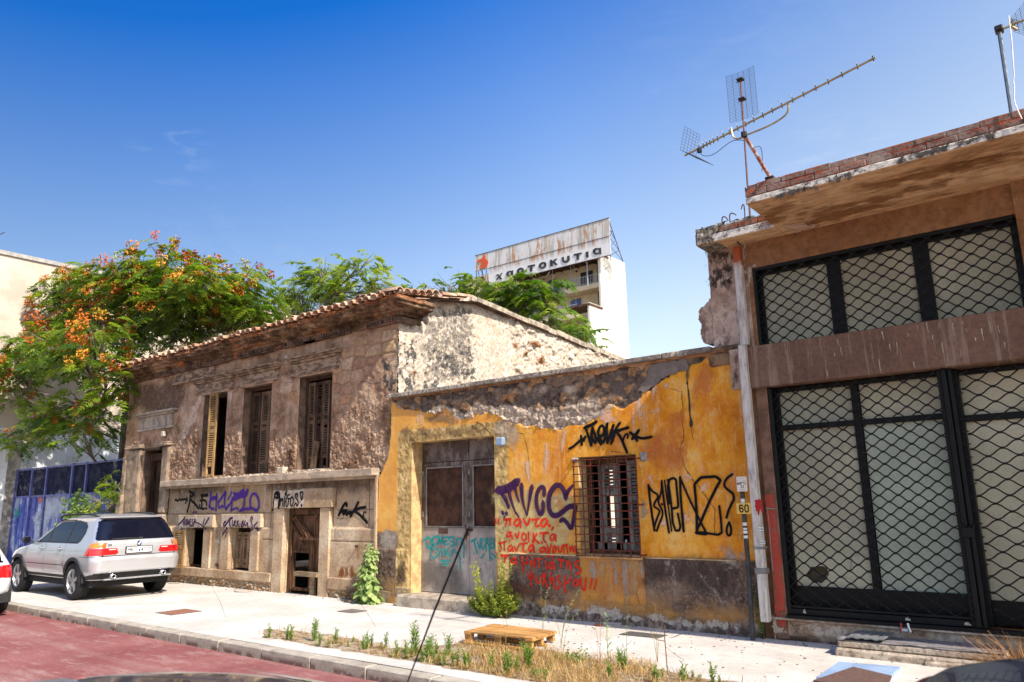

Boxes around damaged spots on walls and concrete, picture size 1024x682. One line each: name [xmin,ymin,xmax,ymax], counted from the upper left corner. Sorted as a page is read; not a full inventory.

leakage [756,143,1023,228]
flaking render [392,341,707,430]
crack [673,366,718,537]
leakage [590,560,736,614]